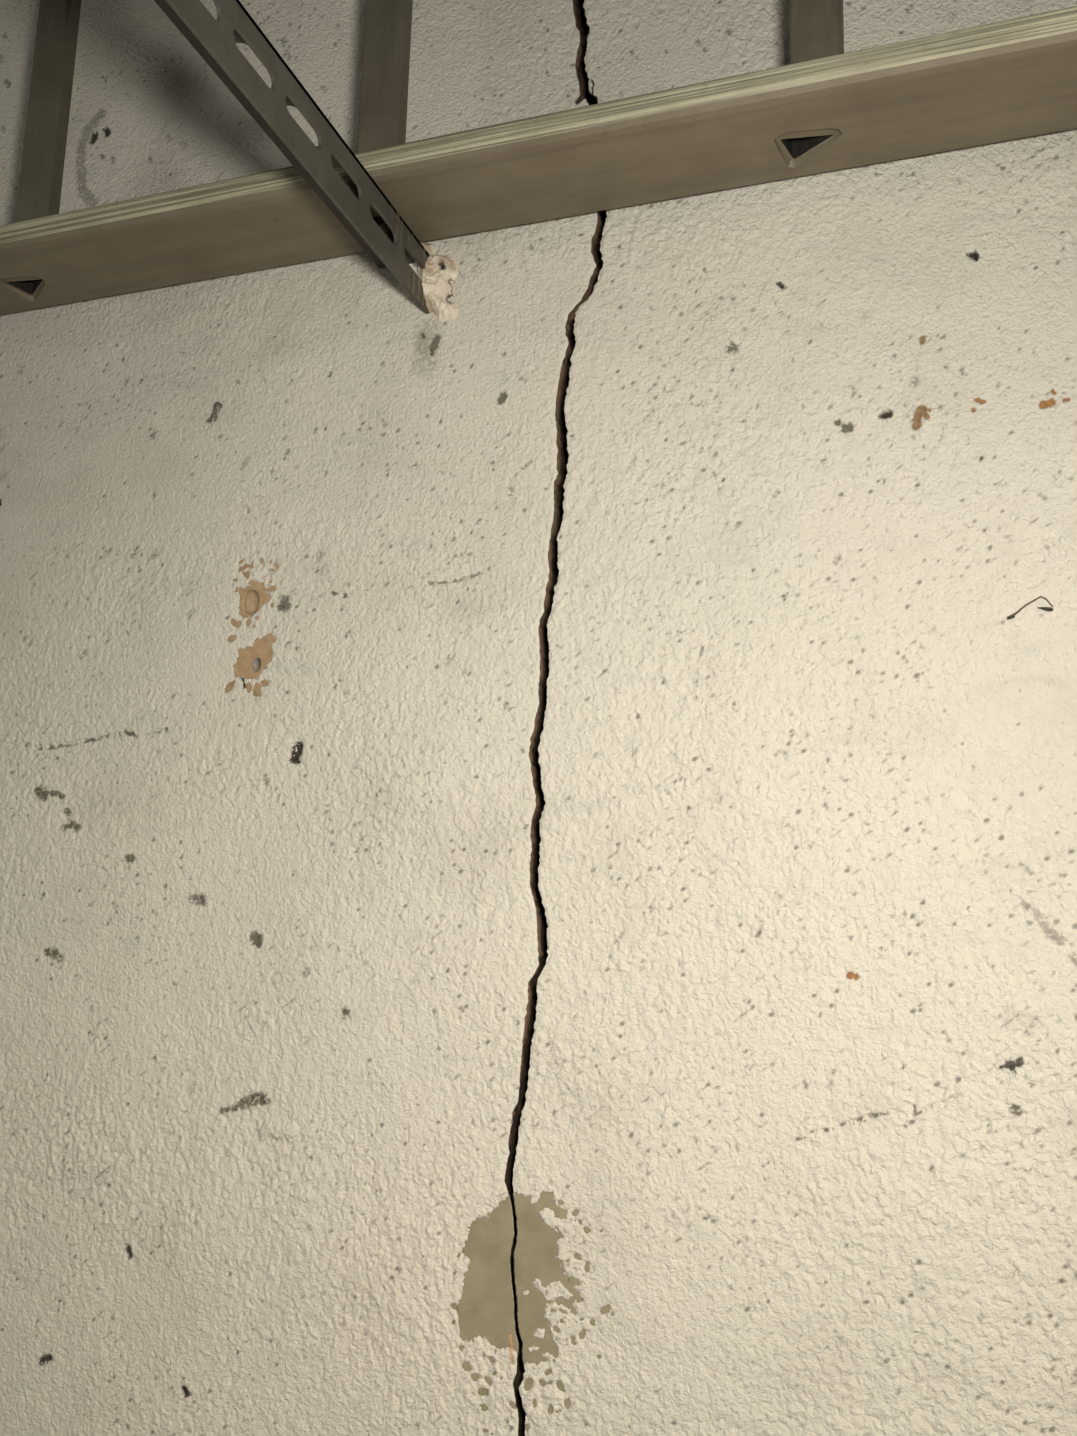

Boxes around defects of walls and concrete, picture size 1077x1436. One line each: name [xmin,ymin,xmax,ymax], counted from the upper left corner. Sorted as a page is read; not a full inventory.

crack [573,0,598,106]
peeling [225,559,290,697]
crack [505,210,607,1436]
peeling [451,1191,611,1414]